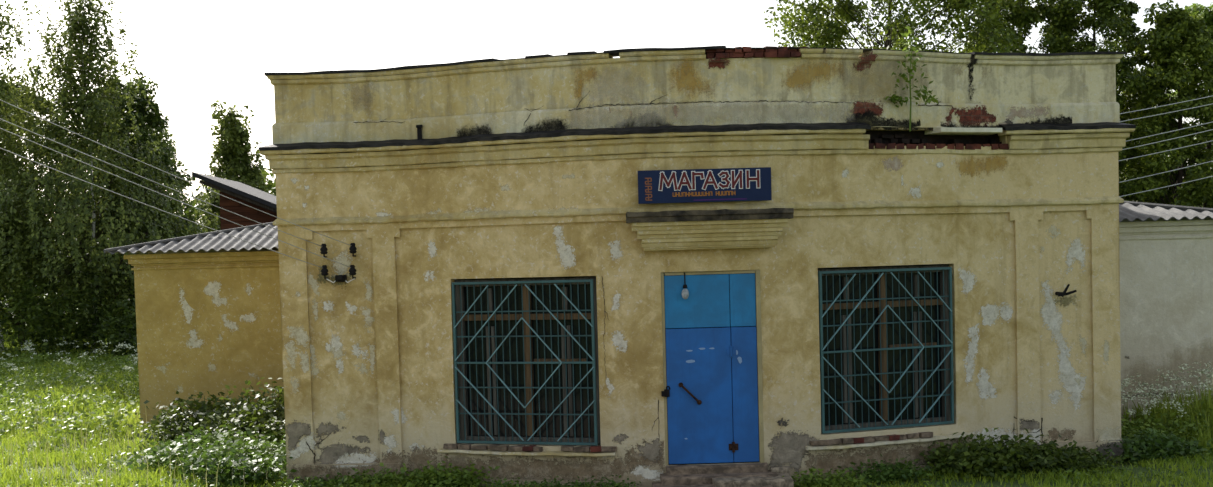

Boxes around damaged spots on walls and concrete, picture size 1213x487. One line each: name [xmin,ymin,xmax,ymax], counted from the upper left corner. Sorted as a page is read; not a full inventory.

flaking render [705,46,801,70]
flaking render [850,100,1050,199]
peeling [178,280,257,349]
peeling [552,225,576,270]
peeling [956,267,977,294]
peeling [963,302,1013,400]
peeling [1040,280,1087,410]
spalling [284,408,665,485]
spalling [768,418,1076,479]